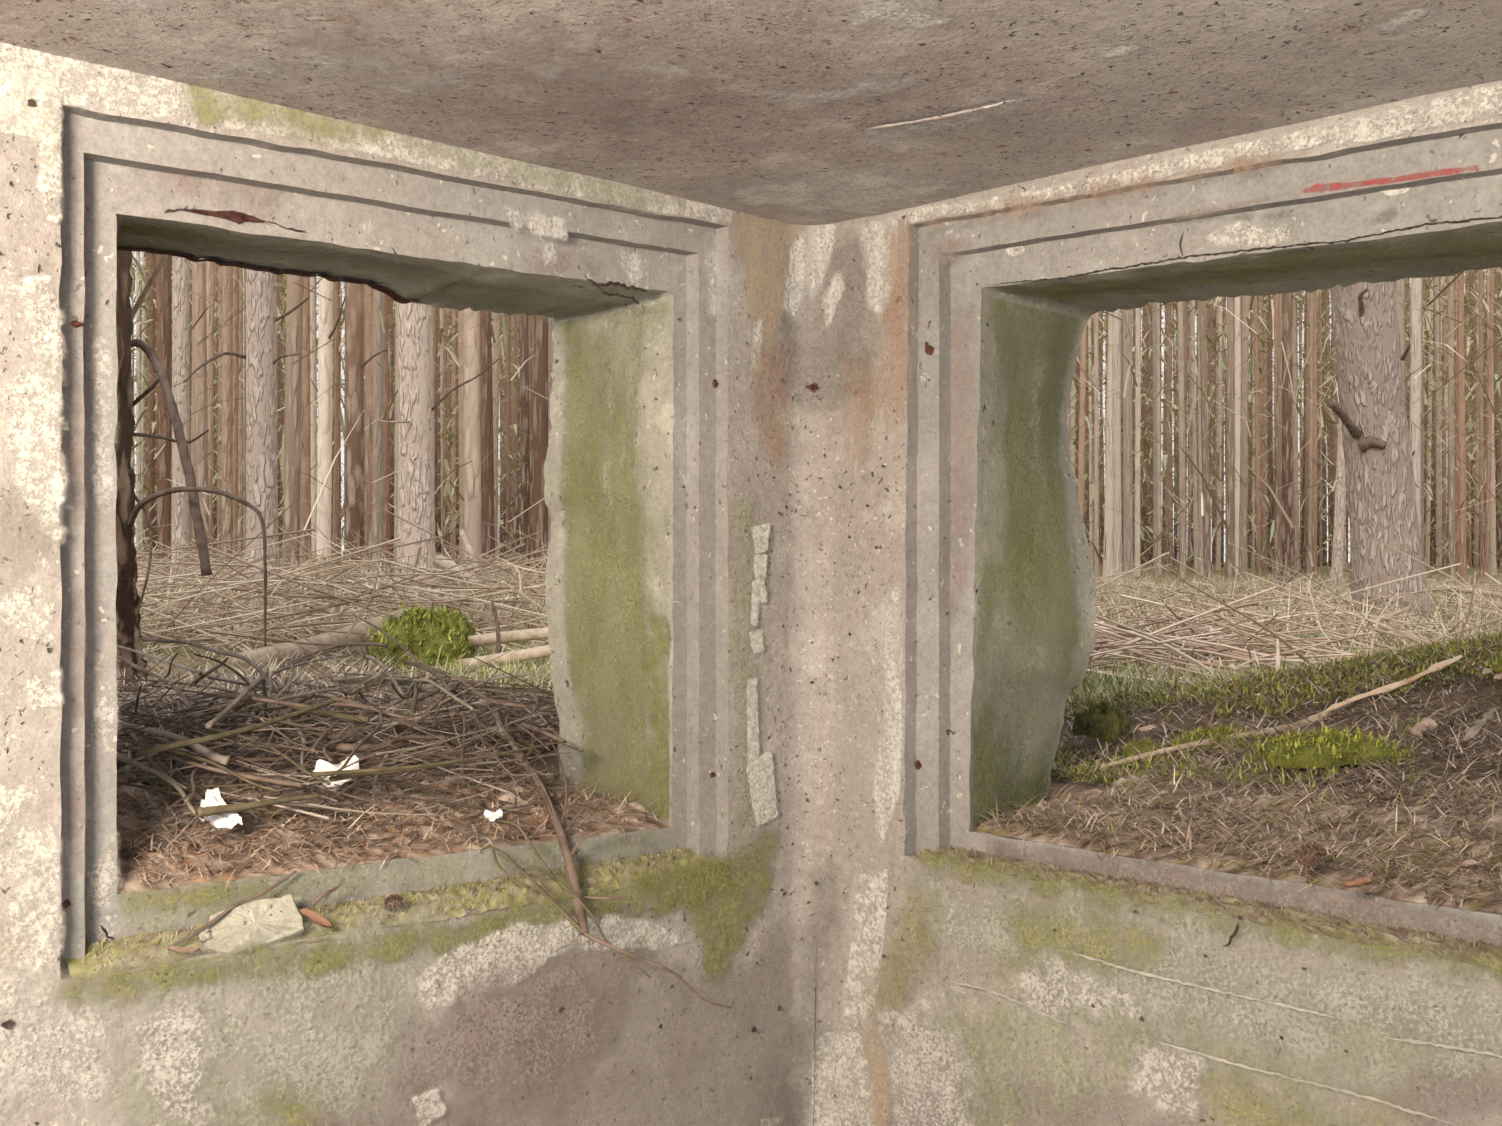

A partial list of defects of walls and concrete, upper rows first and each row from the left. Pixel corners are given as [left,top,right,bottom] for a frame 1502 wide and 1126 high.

crack [267,220,307,233]
crack [995,216,1502,285]
crack [583,274,647,304]
leakage [995,842,1502,945]
leakage [920,875,1502,1100]